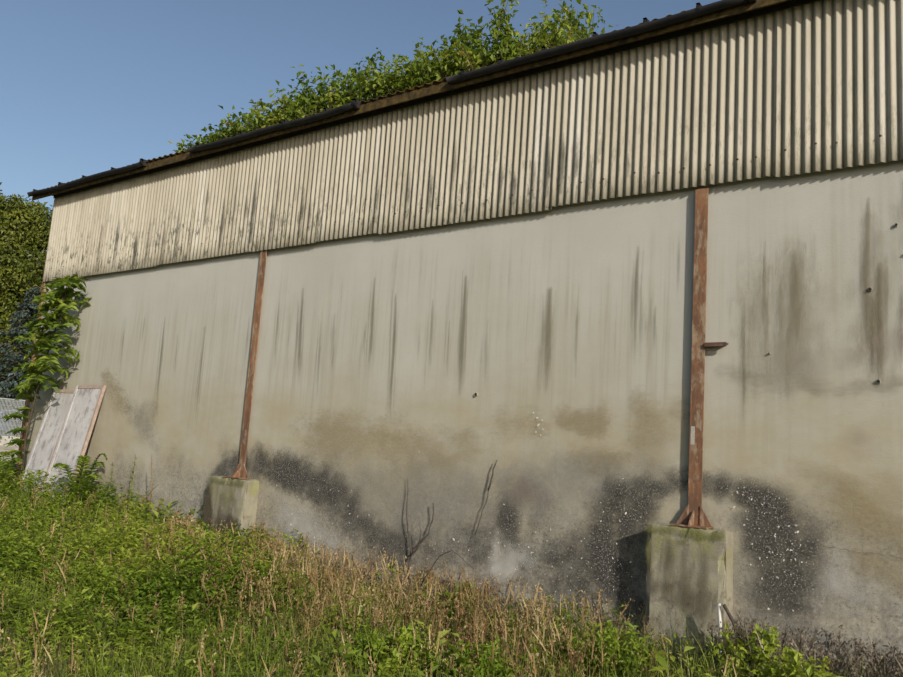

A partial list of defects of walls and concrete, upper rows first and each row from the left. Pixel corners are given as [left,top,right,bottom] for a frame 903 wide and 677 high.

damp [546,146,564,182]
damp [866,209,888,363]
damp [202,448,443,564]
damp [453,475,688,621]
damp [702,476,823,616]